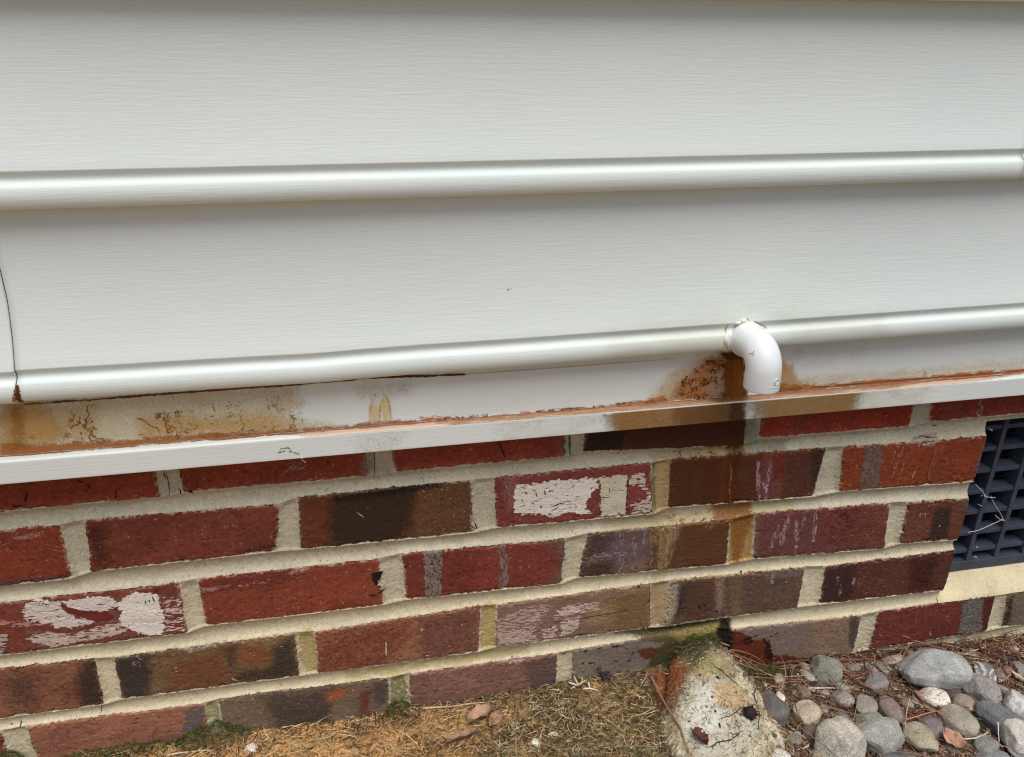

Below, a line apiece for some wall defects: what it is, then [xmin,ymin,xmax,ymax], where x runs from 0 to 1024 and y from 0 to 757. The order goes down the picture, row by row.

damp [0,384,409,478]
corrosion [0,346,1024,567]